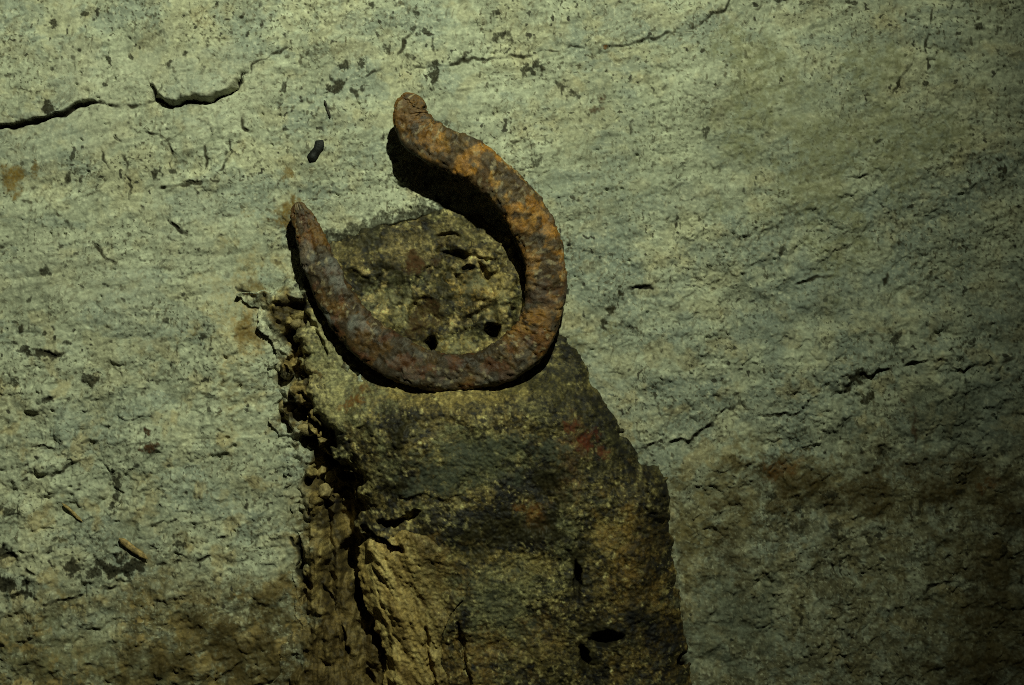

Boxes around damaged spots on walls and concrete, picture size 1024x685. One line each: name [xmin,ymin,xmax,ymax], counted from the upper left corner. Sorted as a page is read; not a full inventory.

crack [0,47,288,130]
spalling [601,285,624,329]
crack [871,358,1013,376]
crack [641,392,841,448]
spalling [236,279,471,685]